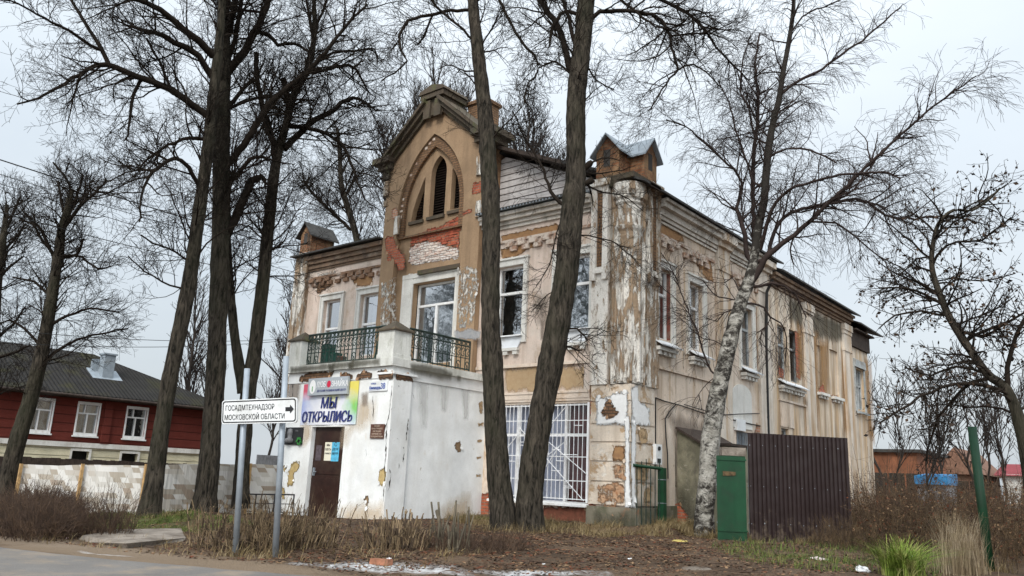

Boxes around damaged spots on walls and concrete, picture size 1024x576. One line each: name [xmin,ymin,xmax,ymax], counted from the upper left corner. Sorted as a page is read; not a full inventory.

flaking render [351,209,479,328]
peeling [282,460,300,500]
peeling [543,366,650,523]
leakage [790,302,842,426]
leakage [865,361,874,441]